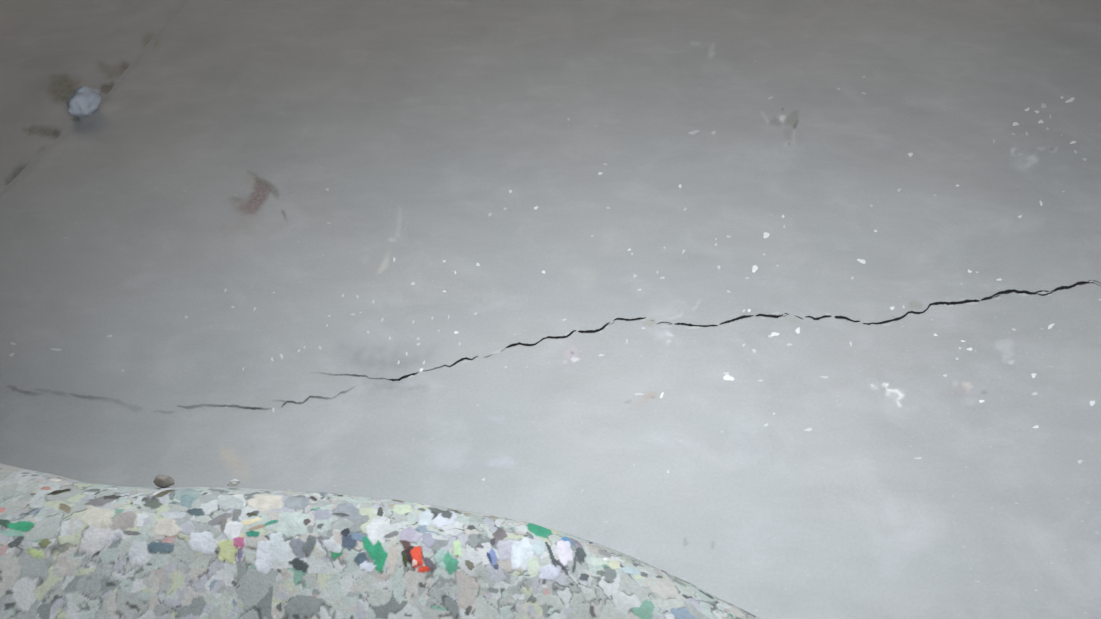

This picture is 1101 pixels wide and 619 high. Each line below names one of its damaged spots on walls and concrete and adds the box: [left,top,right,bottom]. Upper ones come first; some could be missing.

crack [0,280,1101,414]